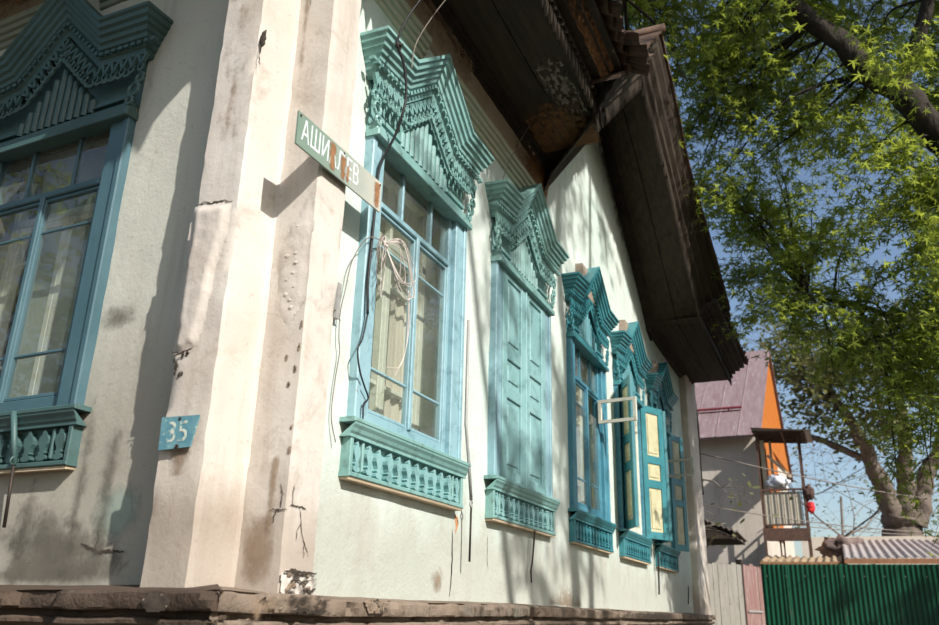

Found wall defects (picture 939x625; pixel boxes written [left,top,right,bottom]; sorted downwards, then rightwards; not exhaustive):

peeling [536,59,587,113]
leakage [4,509,118,581]
crack [81,528,124,554]
crack [269,484,308,558]
flaking render [264,568,329,616]